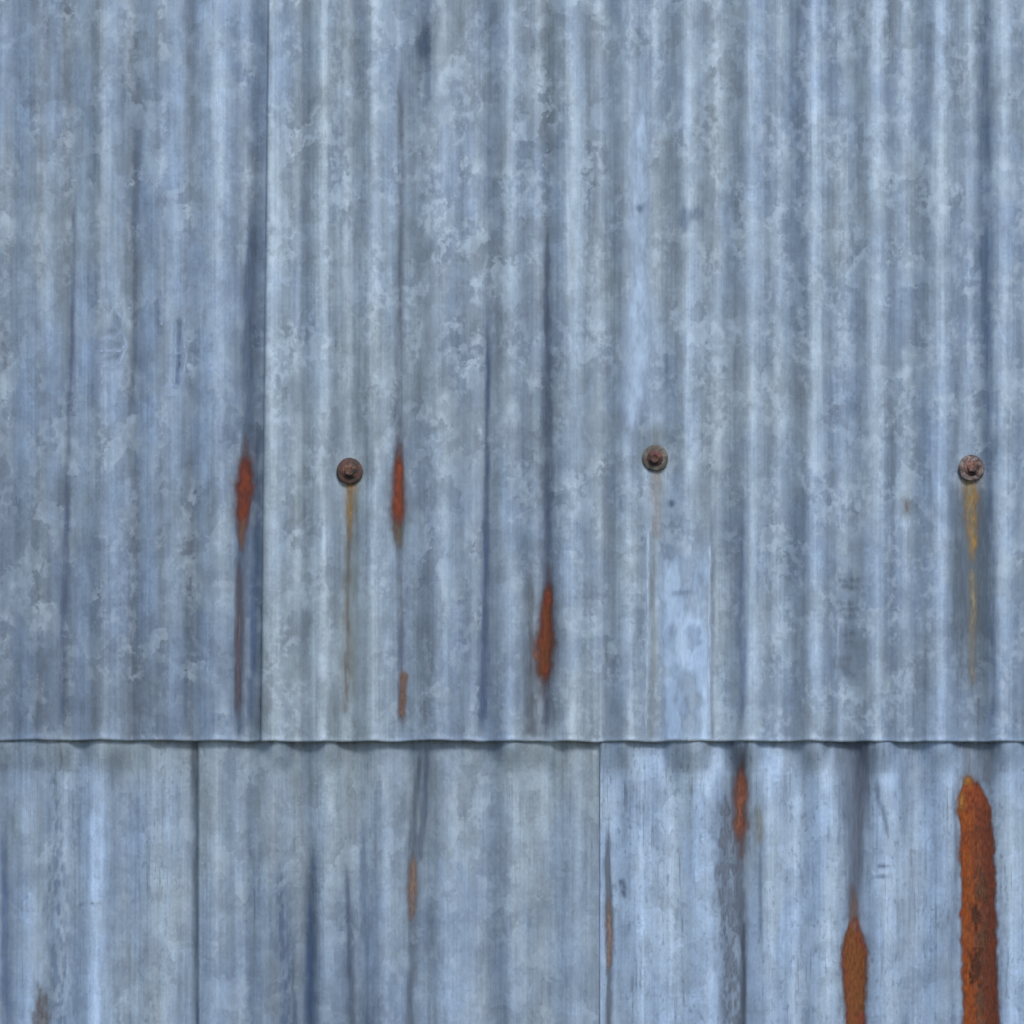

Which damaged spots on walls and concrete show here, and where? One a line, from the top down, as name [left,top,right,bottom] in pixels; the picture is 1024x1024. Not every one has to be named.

rust [236,446,253,540]
rust [392,448,404,544]
rust [534,575,553,687]
rust [399,672,407,716]
rust [734,771,760,856]
rust [957,777,1000,1024]
rust [841,894,868,1024]